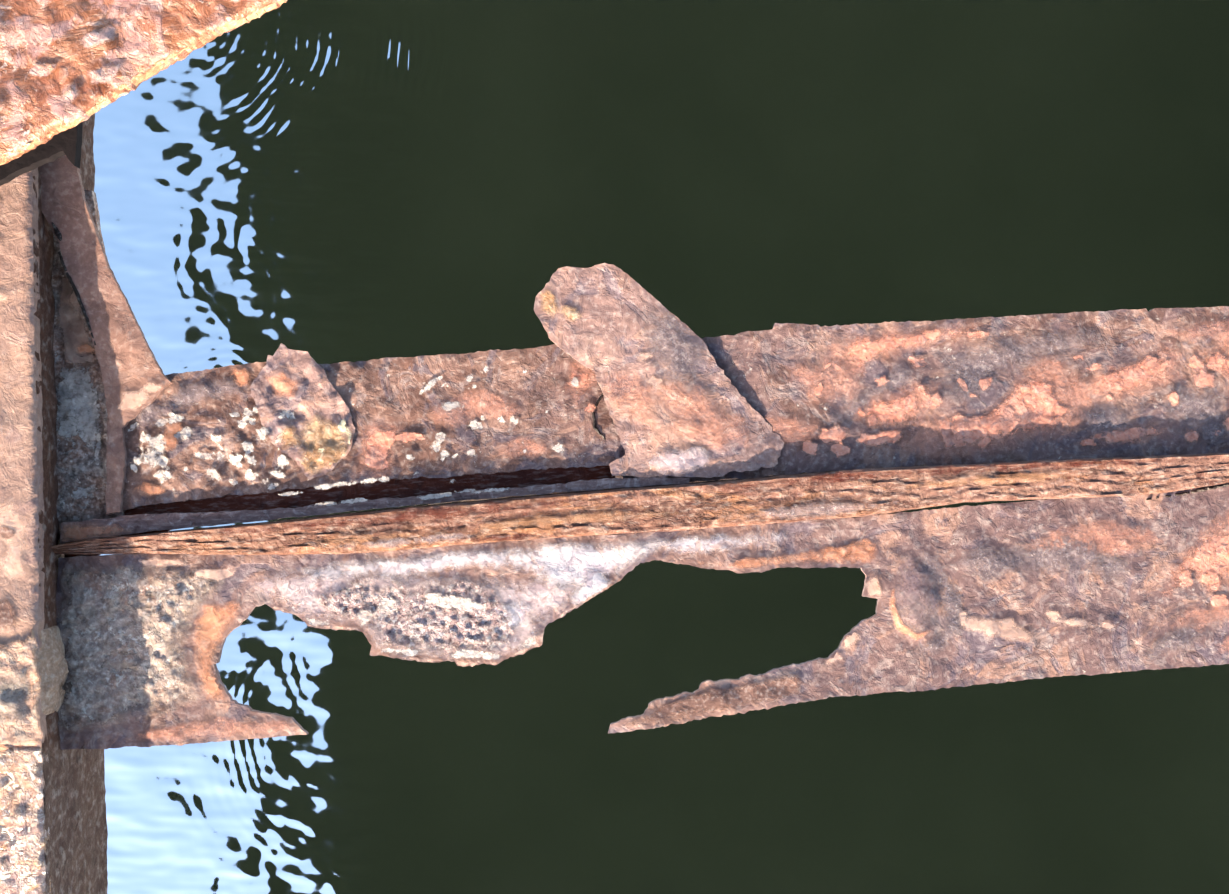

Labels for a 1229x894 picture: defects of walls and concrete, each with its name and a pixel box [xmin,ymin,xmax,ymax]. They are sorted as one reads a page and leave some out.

rust [122,384,161,409]
crack [571,357,613,440]
rust [281,419,345,473]
rust [137,484,163,495]
rust [223,498,652,542]
rust [735,541,873,567]
peeling [309,588,365,630]
peeling [868,579,880,596]
rust [197,604,235,695]
peeling [387,609,502,666]
peeling [827,634,857,664]
rust [629,676,800,726]